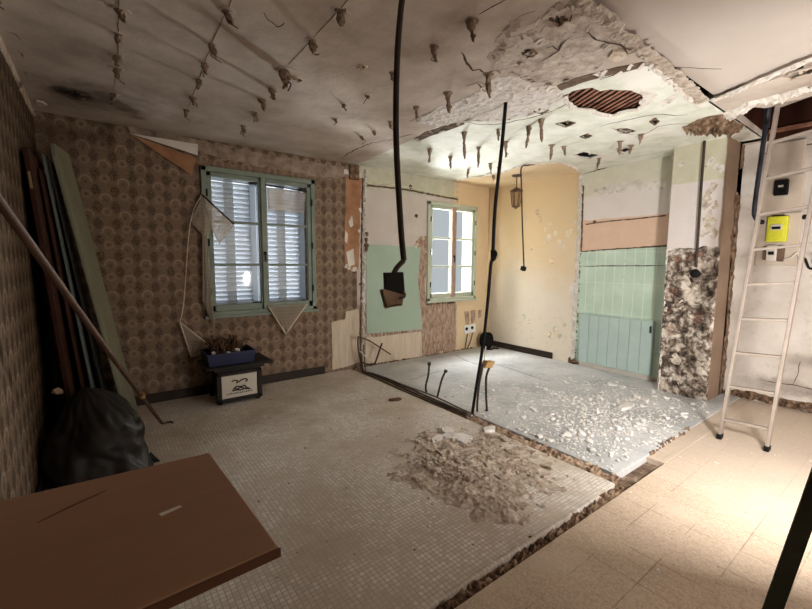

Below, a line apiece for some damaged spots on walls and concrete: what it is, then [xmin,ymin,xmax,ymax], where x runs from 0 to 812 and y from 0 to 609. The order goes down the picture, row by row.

damp [55,87,90,98]
flaking render [127,126,457,272]
flaking render [484,0,812,108]
peeling [705,156,725,173]
flaking render [682,85,812,139]
peeling [365,235,456,364]
spalling [657,182,721,401]
flaking render [719,192,741,393]